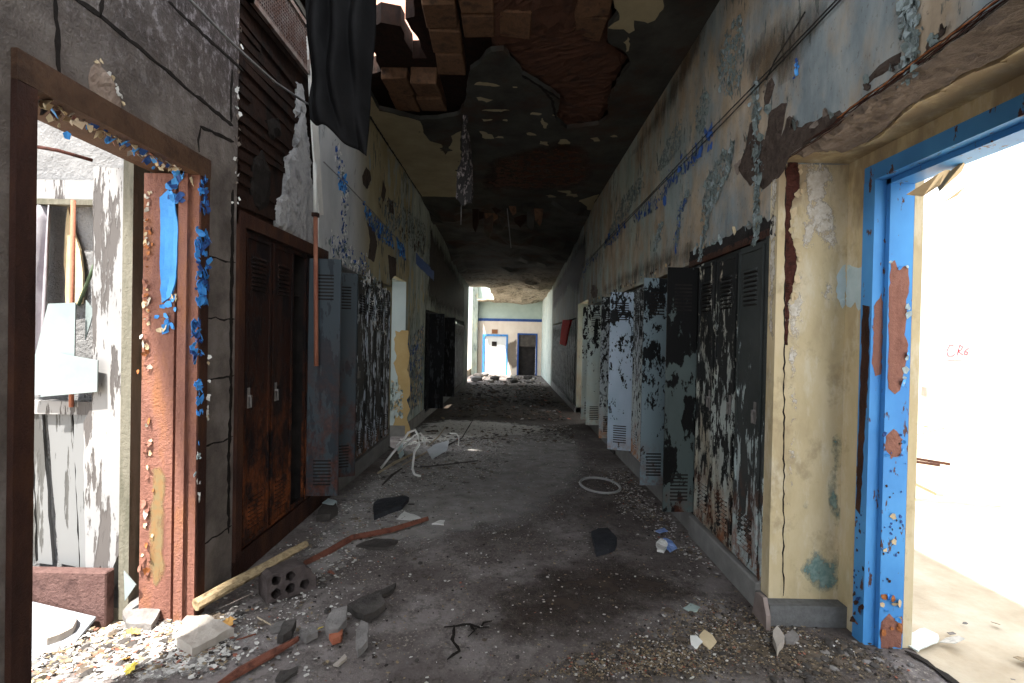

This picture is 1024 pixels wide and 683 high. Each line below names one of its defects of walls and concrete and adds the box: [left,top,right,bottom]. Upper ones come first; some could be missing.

crack [53,0,244,152]
peeling [273,82,313,244]
spalling [592,0,1024,345]
crack [780,166,788,596]
rust [855,305,870,514]
rust [150,468,165,585]
leakage [804,553,837,588]
rust [850,591,864,625]
rust [880,594,903,649]